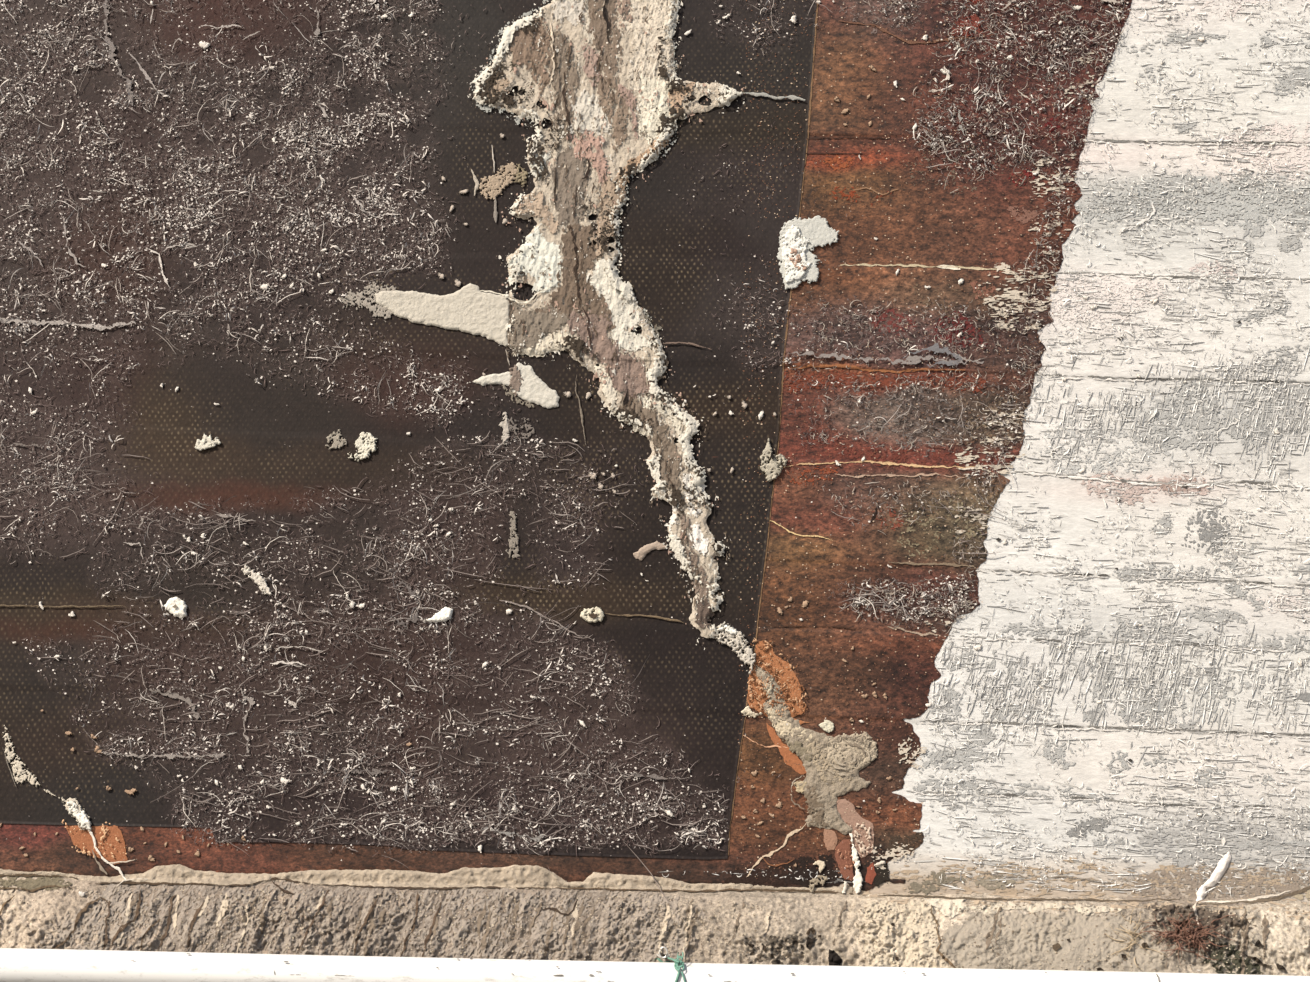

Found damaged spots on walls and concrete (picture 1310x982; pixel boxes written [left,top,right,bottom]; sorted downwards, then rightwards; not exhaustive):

spalling [491,56,565,153]
hole [578,200,621,260]
corrosion [788,248,807,270]
corrosion [1075,471,1210,506]
peeling [747,641,809,775]
peeling [823,799,876,885]
crack [0,822,1310,968]
leakage [1146,902,1270,974]